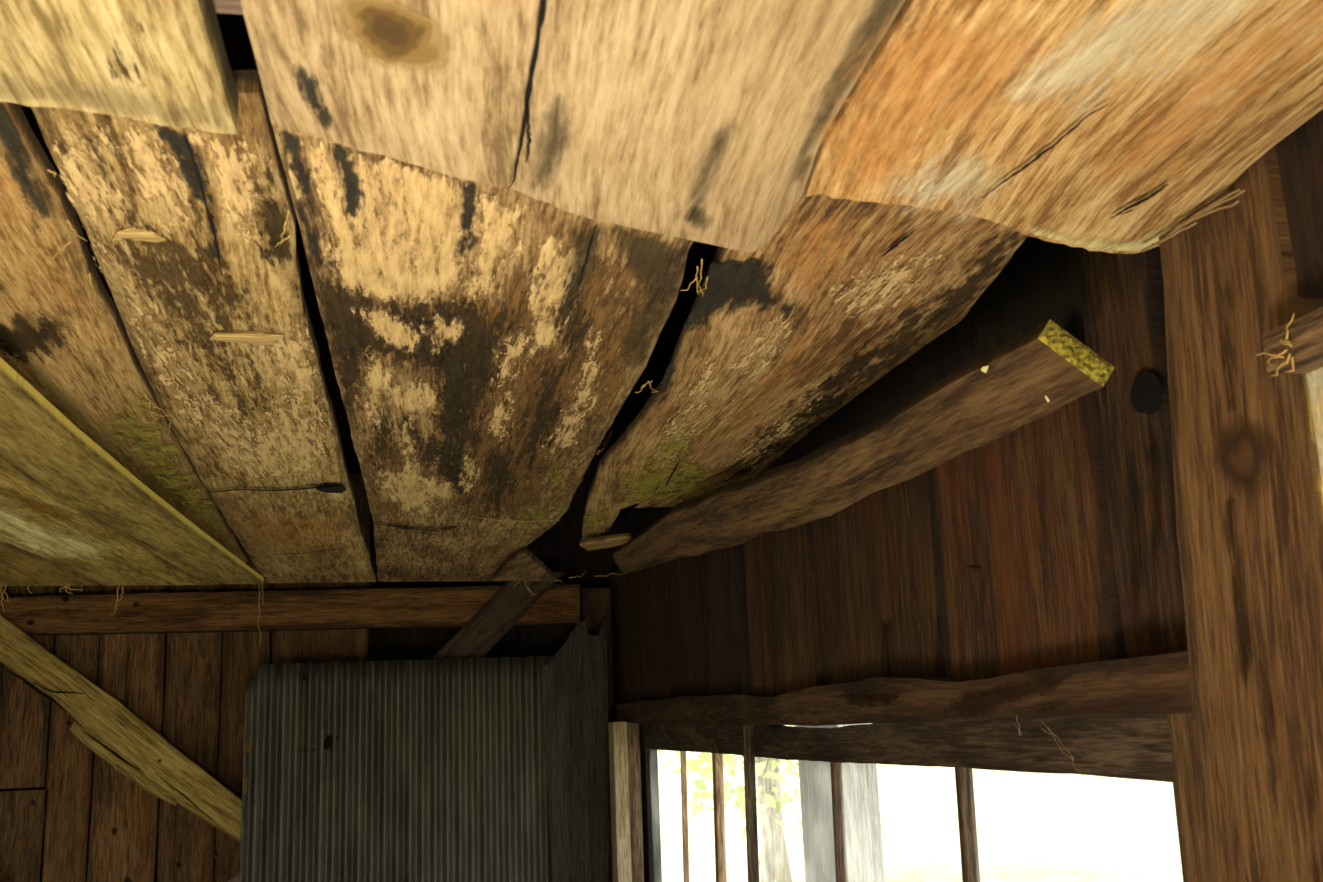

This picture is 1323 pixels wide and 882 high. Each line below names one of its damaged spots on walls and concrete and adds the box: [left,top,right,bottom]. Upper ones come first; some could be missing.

water stain [0,107,50,229]
water stain [292,68,332,128]
crack [507,0,546,189]
water stain [542,116,564,177]
water stain [0,309,71,365]
water stain [77,114,279,437]
water stain [252,133,676,516]
water stain [683,259,797,332]